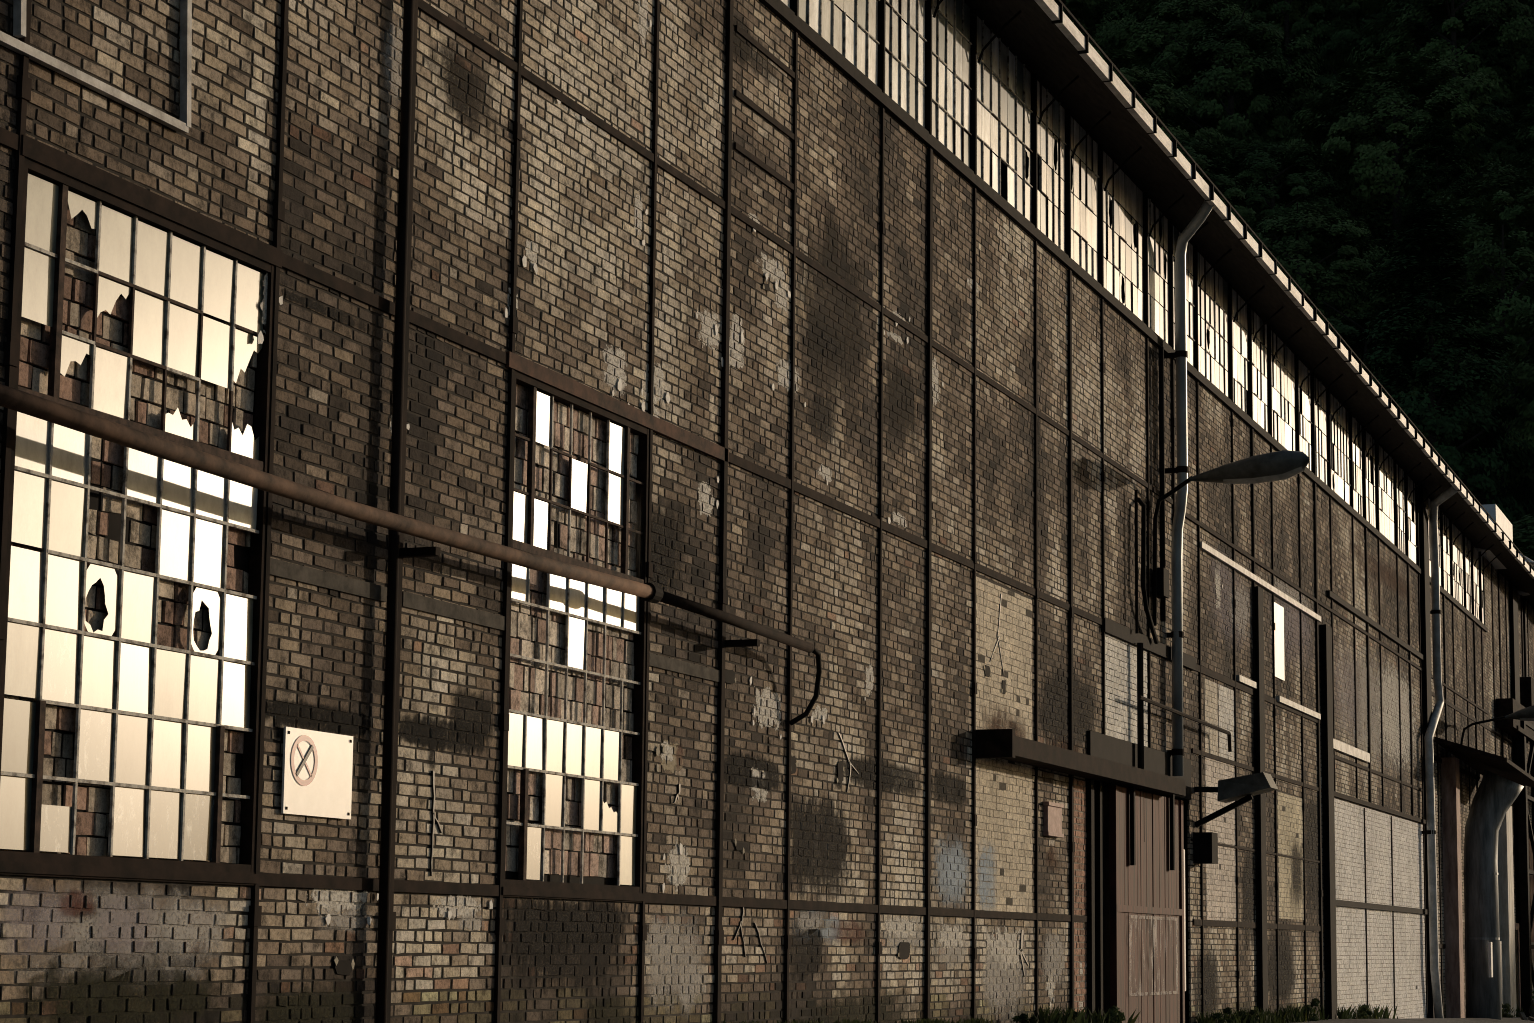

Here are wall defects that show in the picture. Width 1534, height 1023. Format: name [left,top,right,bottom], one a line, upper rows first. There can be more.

water stain [431,43,490,133]
water stain [798,214,861,444]
rust [513,386,644,584]
rust [518,769,529,880]